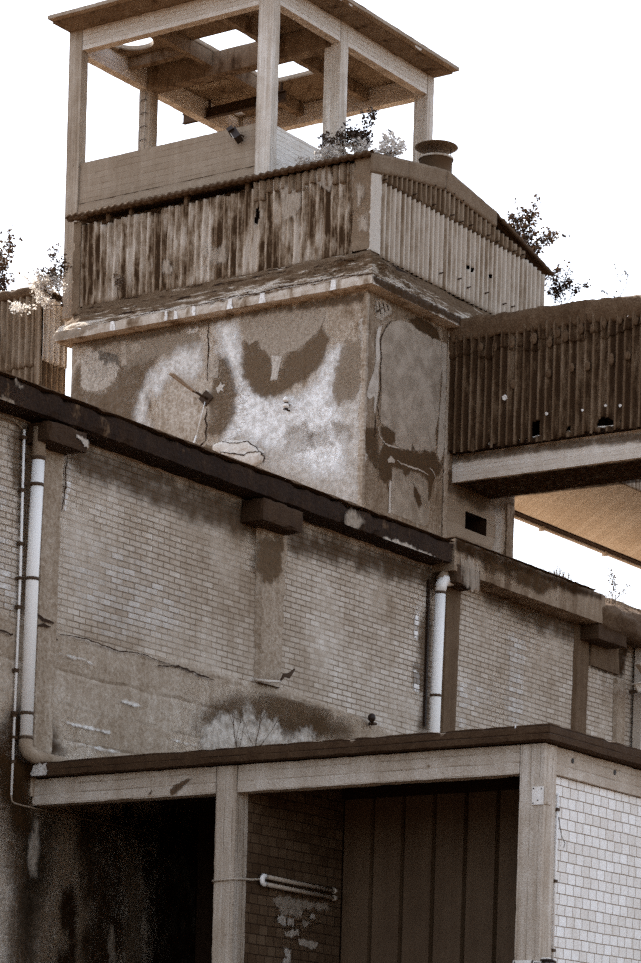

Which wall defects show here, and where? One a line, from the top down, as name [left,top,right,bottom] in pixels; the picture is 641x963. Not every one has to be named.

peeling [358,299,447,460]
crack [60,455,68,512]
water stain [53,275,641,638]
peeling [388,469,430,526]
crack [37,613,215,681]
water stain [201,694,349,750]
water stain [0,708,91,963]
peeling [273,895,329,963]